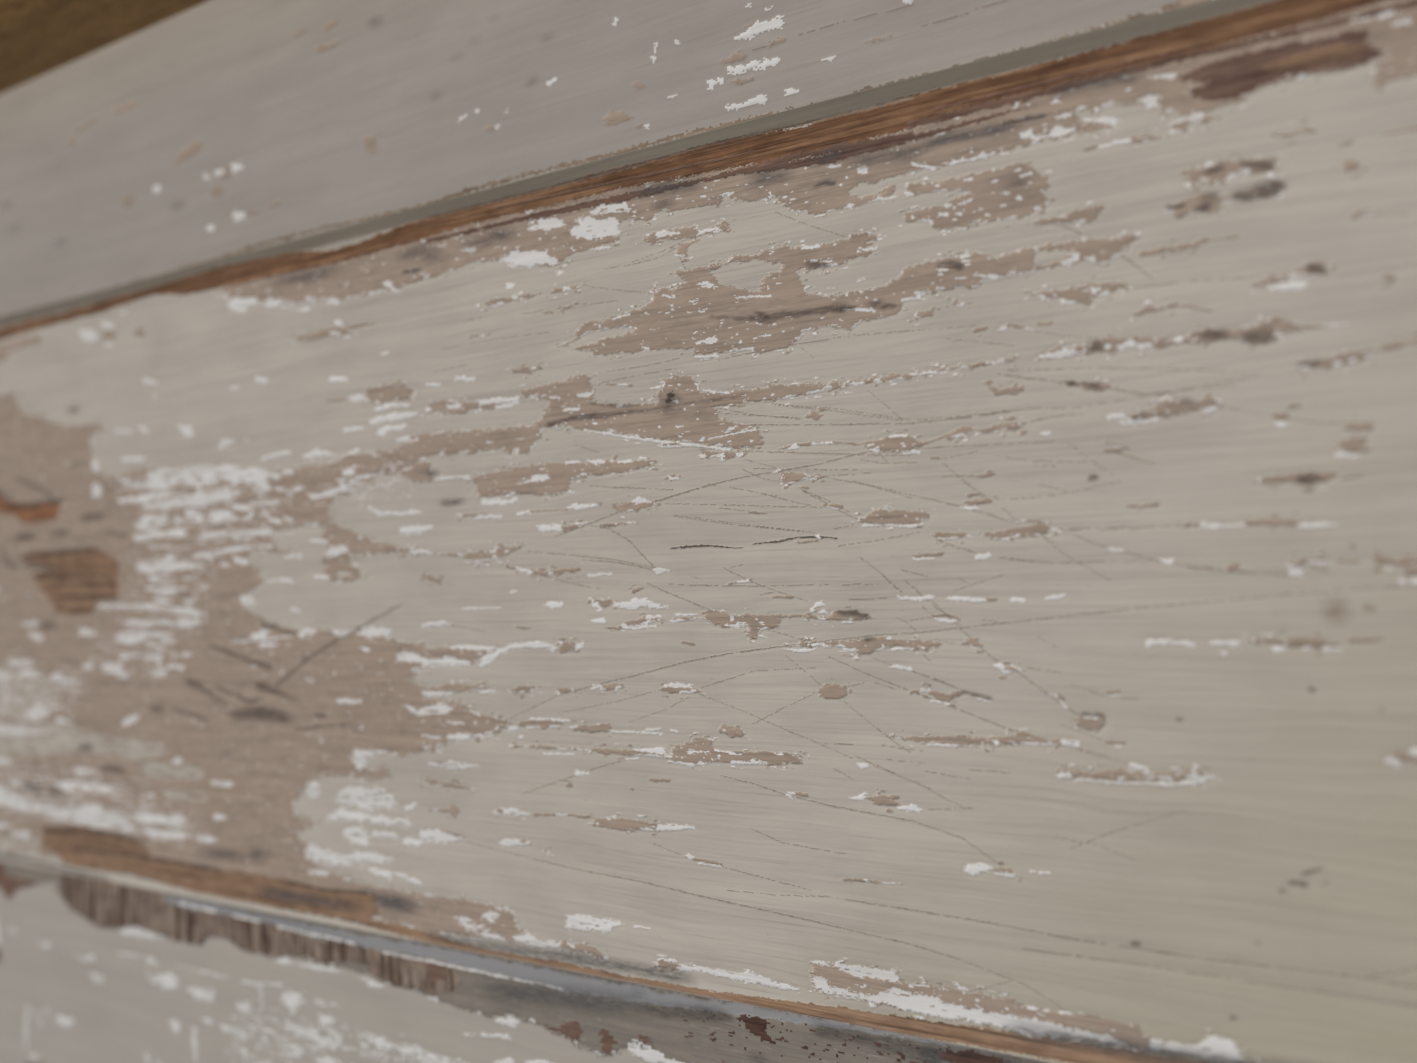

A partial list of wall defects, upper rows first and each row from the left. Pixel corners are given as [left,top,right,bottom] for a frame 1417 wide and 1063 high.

peeling [202,160,244,180]
peeling [216,0,1417,594]
crack [670,534,837,549]
peeling [0,438,361,685]
peeling [897,595,1027,623]
peeling [588,587,942,671]
peeling [1145,630,1382,657]
peeling [818,678,852,701]
peeling [908,683,992,706]
peeling [0,703,72,736]
peeling [884,692,1221,788]
peeling [0,748,1264,1063]